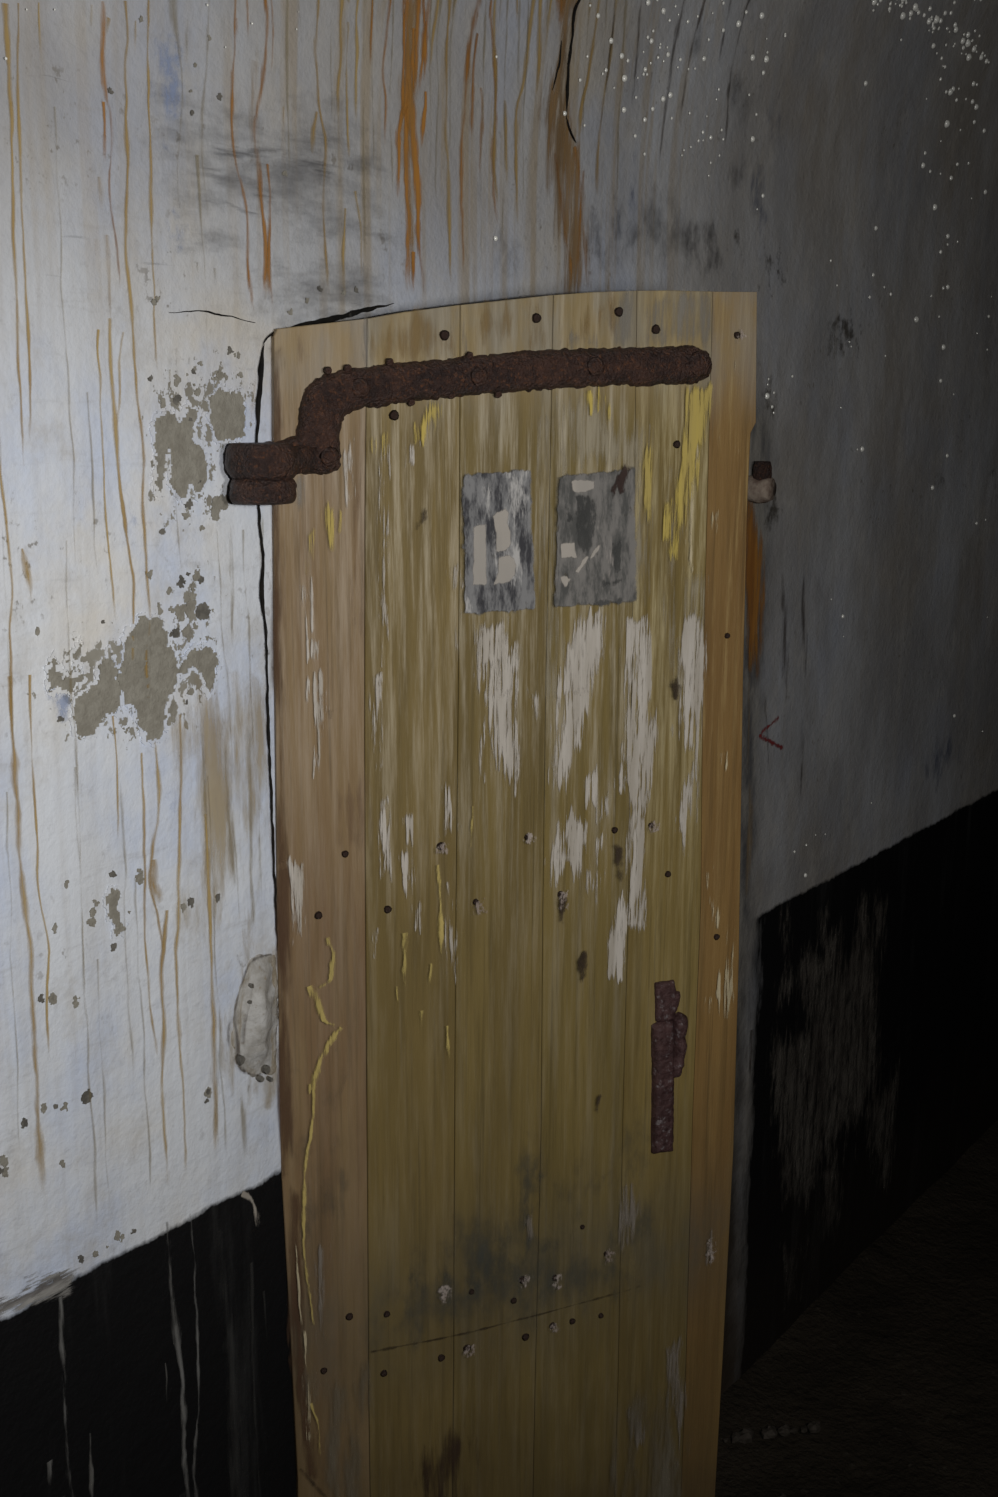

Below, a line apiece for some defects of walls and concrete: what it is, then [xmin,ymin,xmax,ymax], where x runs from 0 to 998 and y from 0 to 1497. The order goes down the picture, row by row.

rust [3,3,31,434]
rust [101,1,128,138]
rust [97,71,149,639]
peeling [142,346,264,535]
rust [242,164,271,284]
rust [337,0,451,276]
rust [445,0,552,264]
crack [552,0,581,143]
rust [0,469,50,1073]
peeling [27,562,222,750]
rust [745,503,765,670]
rust [141,753,184,1090]